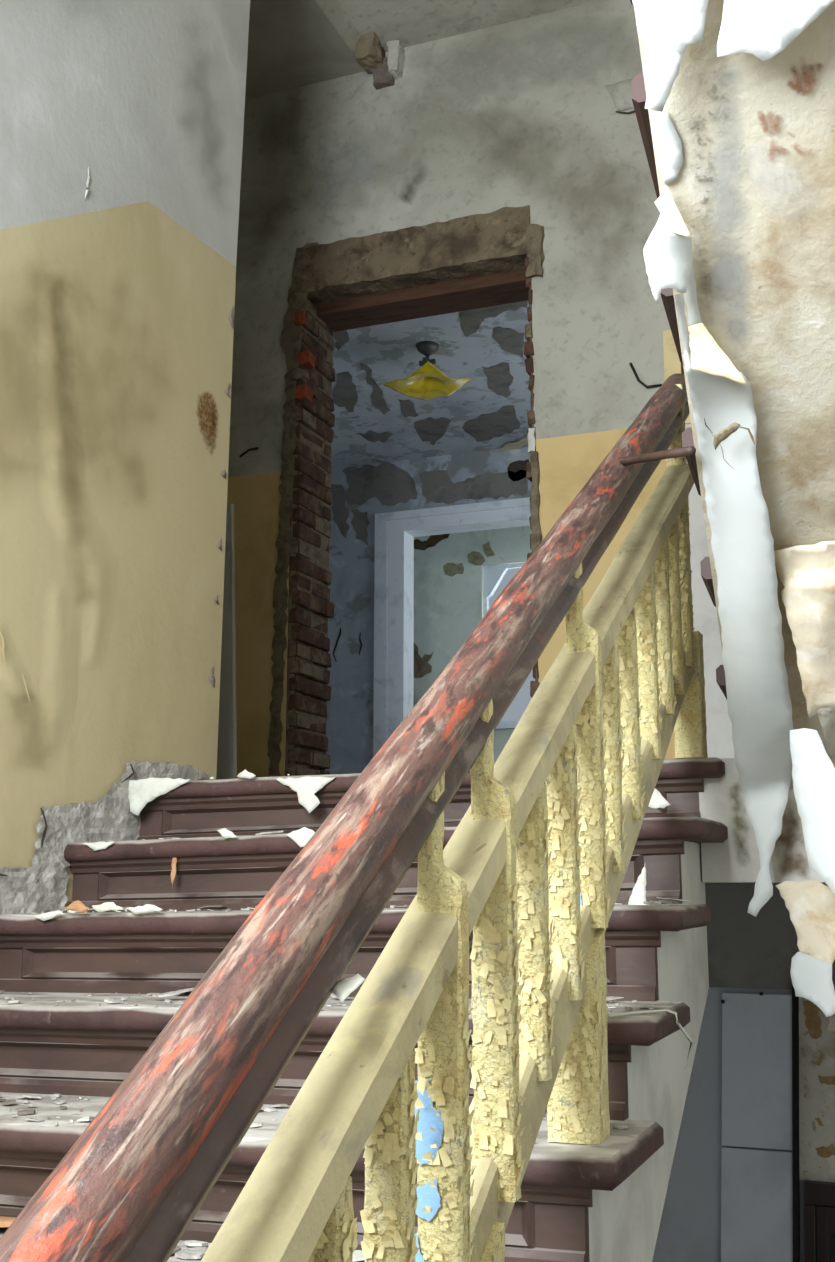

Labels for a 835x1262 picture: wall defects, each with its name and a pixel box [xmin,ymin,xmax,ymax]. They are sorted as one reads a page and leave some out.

spalling [525,224,545,278]
peeling [330,301,542,553]
spalling [237,242,335,813]
peeling [606,0,835,1039]
spalling [0,761,209,921]
peeling [285,827,315,847]
peeling [816,1053,835,1086]
peeling [815,1146,835,1158]